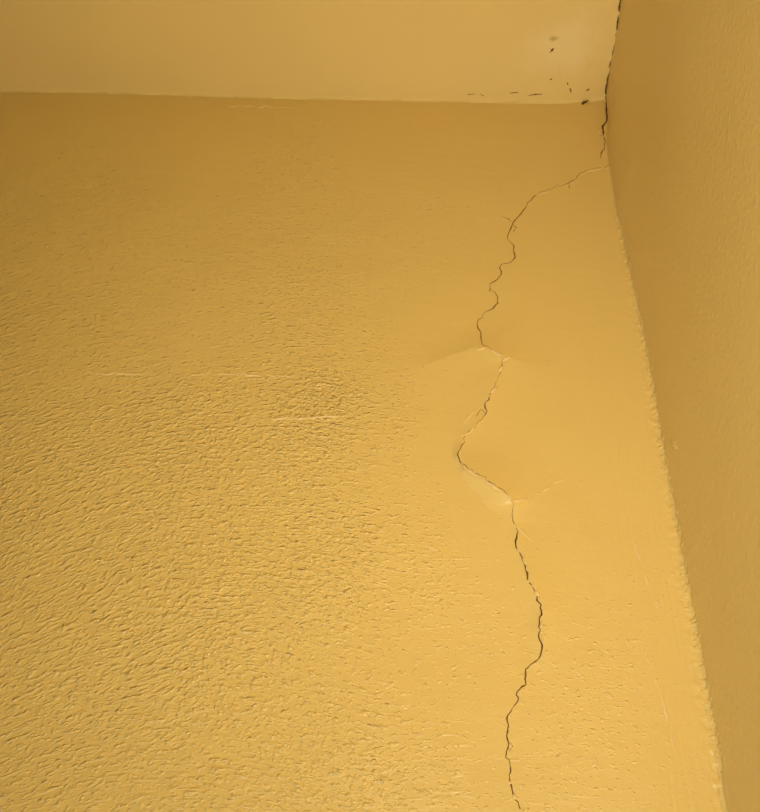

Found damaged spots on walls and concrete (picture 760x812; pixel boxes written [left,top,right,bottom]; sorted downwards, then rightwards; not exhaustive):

crack [457,0,621,812]